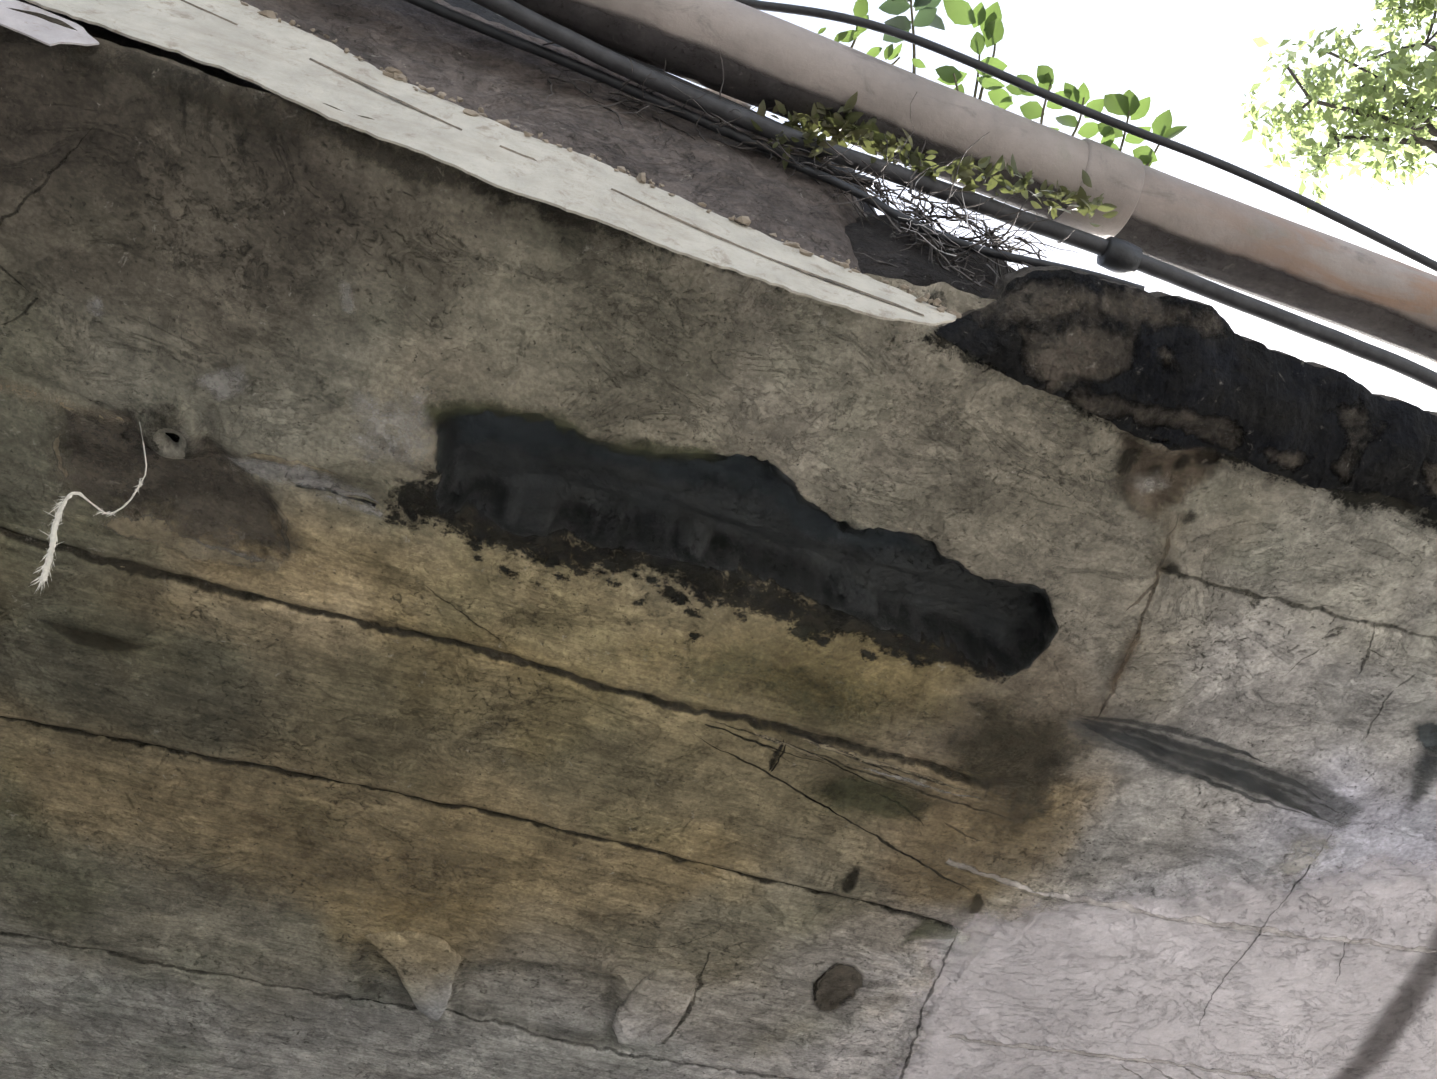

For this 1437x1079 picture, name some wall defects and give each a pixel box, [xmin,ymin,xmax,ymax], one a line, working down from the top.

peeling [0,0,99,46]
spalling [380,67,675,196]
spalling [728,215,861,273]
spalling [53,402,1058,683]
crack [697,721,1011,896]
crack [1092,514,1179,723]
leakage [949,703,1361,875]
crack [1359,622,1414,739]
leakage [1412,723,1437,803]
crack [899,927,960,1079]
leakage [897,866,1437,1079]
crack [1199,827,1334,1026]